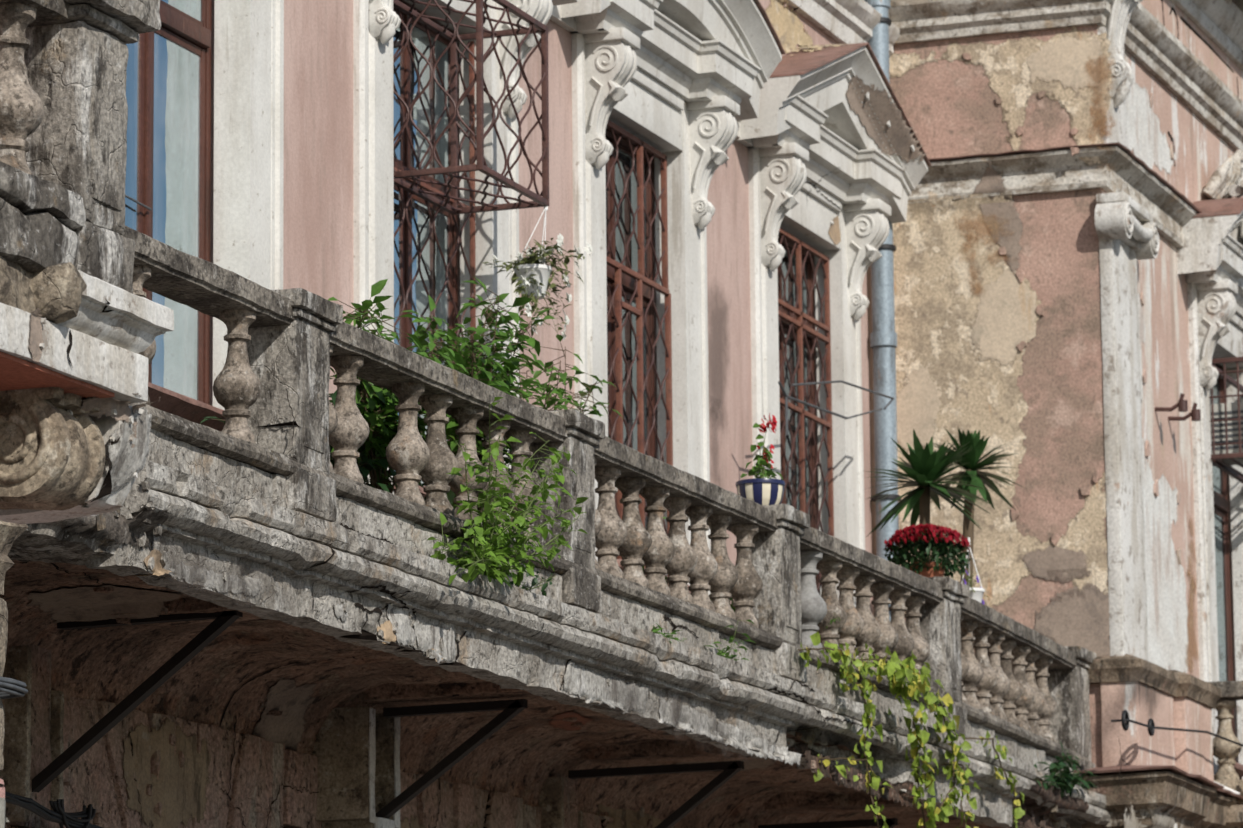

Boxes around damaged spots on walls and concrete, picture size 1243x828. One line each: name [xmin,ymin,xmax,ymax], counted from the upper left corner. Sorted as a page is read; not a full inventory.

spalling [766,0,853,56]
peeling [846,26,1176,174]
spalling [25,389,261,625]
peeling [893,193,1109,610]
peeling [1142,438,1189,673]
peeling [1124,804,1181,828]